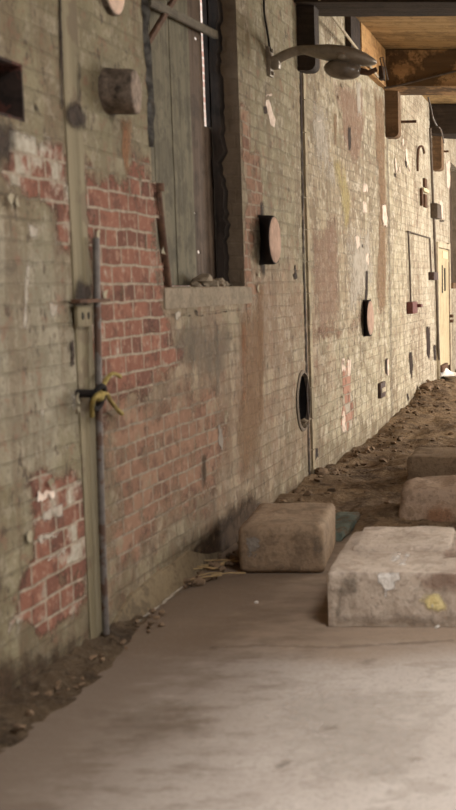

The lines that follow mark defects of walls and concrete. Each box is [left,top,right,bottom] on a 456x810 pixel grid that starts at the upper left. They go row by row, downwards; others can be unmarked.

flaking render [0,131,71,251]
flaking render [84,153,229,583]
spalling [341,358,356,433]
flaking render [8,466,87,637]